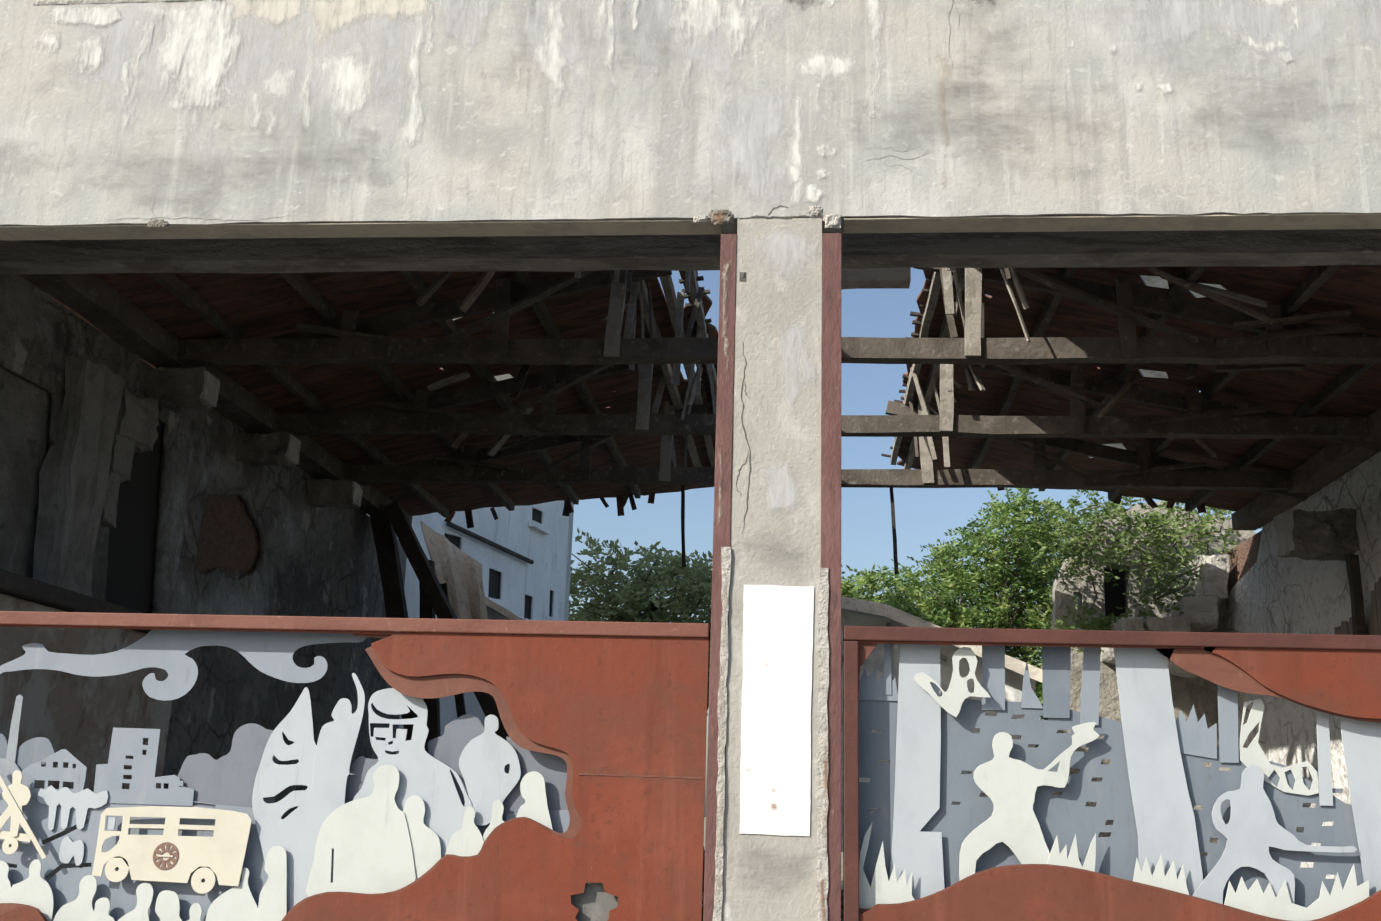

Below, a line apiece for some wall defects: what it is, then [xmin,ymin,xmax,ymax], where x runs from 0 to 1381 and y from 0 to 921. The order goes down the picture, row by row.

damp [39,0,492,145]
crack [736,345,751,533]